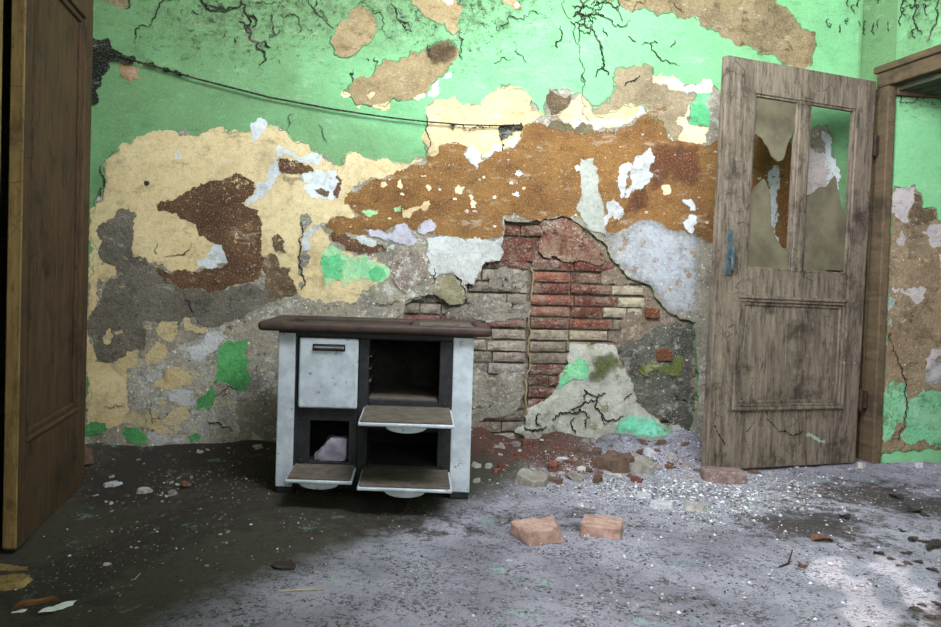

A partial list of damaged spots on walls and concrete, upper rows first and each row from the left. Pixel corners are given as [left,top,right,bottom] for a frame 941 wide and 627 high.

crack [134,0,171,43]
crack [200,0,334,65]
crack [496,0,677,120]
peeling [601,0,817,69]
crack [898,0,939,41]
peeling [810,125,834,159]
peeling [85,0,720,447]
peeling [881,184,941,456]
crack [888,333,908,442]